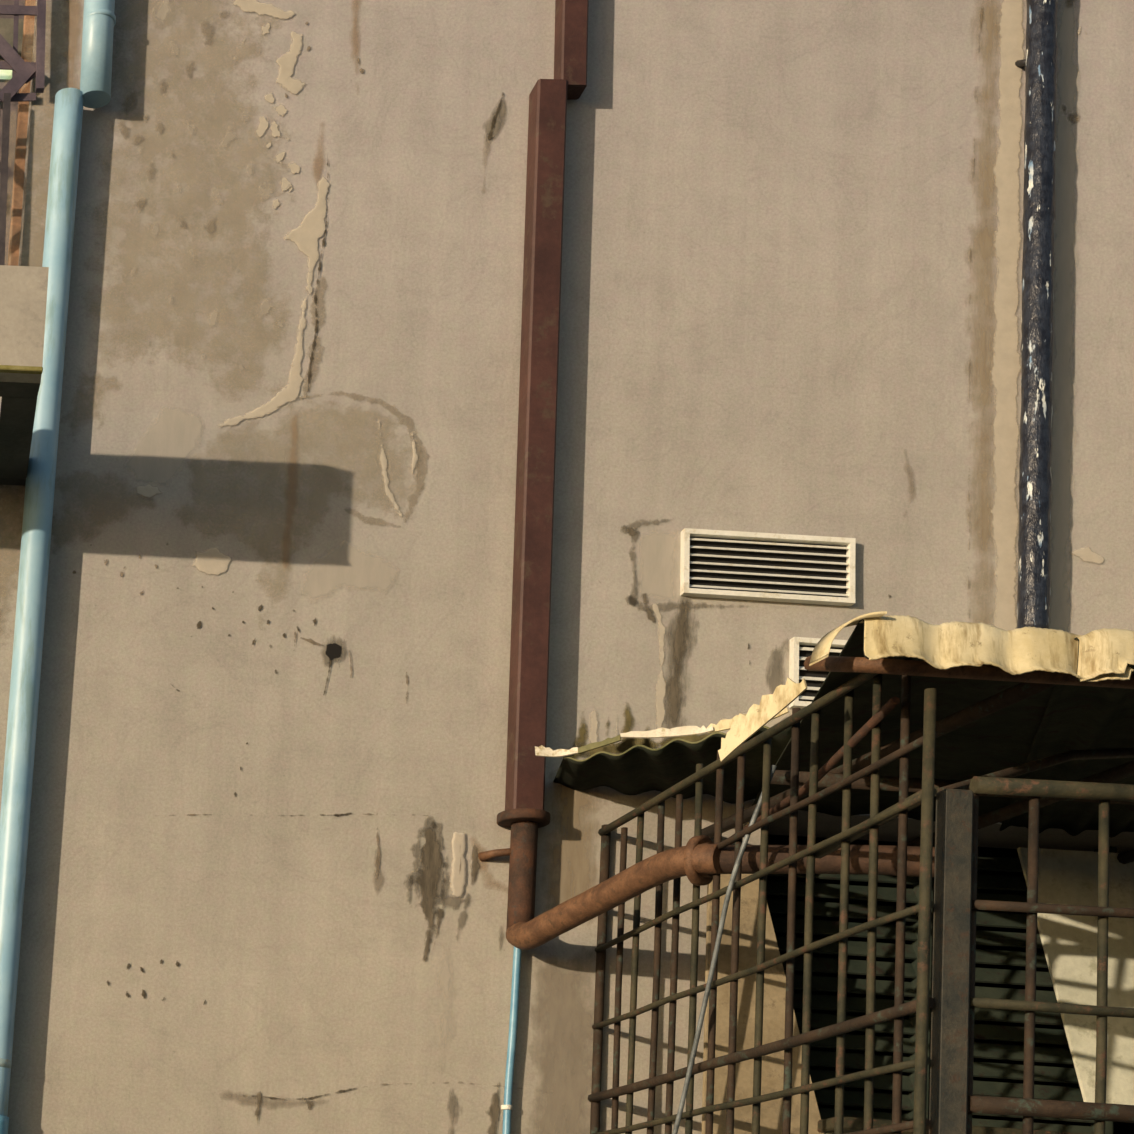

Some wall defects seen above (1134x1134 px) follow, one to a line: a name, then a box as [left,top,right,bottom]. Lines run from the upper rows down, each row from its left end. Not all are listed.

peeling [201,0,311,209]
peeling [218,177,330,427]
crack [307,163,329,391]
water stain [991,0,1024,631]
peeling [193,548,231,588]
spalling [283,619,352,694]
water stain [568,593,748,758]
water stain [767,650,783,694]
water stain [764,708,792,728]
water stain [375,867,383,890]
water stain [406,817,469,961]
crack [226,1088,355,1120]